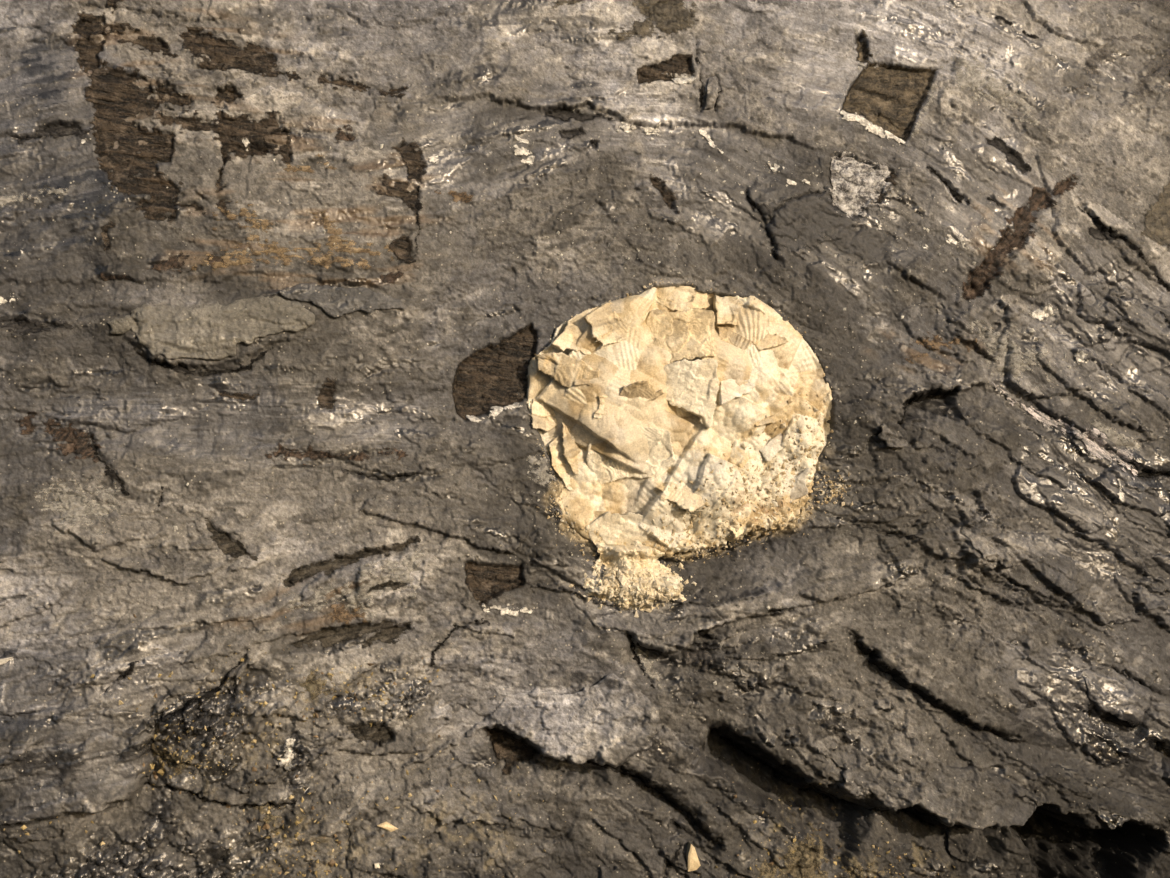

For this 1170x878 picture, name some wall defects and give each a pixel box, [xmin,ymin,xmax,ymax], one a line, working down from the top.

spalling [5,0,301,225]
spalling [313,71,409,99]
spalling [637,53,695,84]
spalling [842,29,937,140]
corrosion [959,174,1079,304]
spalling [453,324,537,420]
crack [899,388,959,425]
spalling [465,562,525,605]